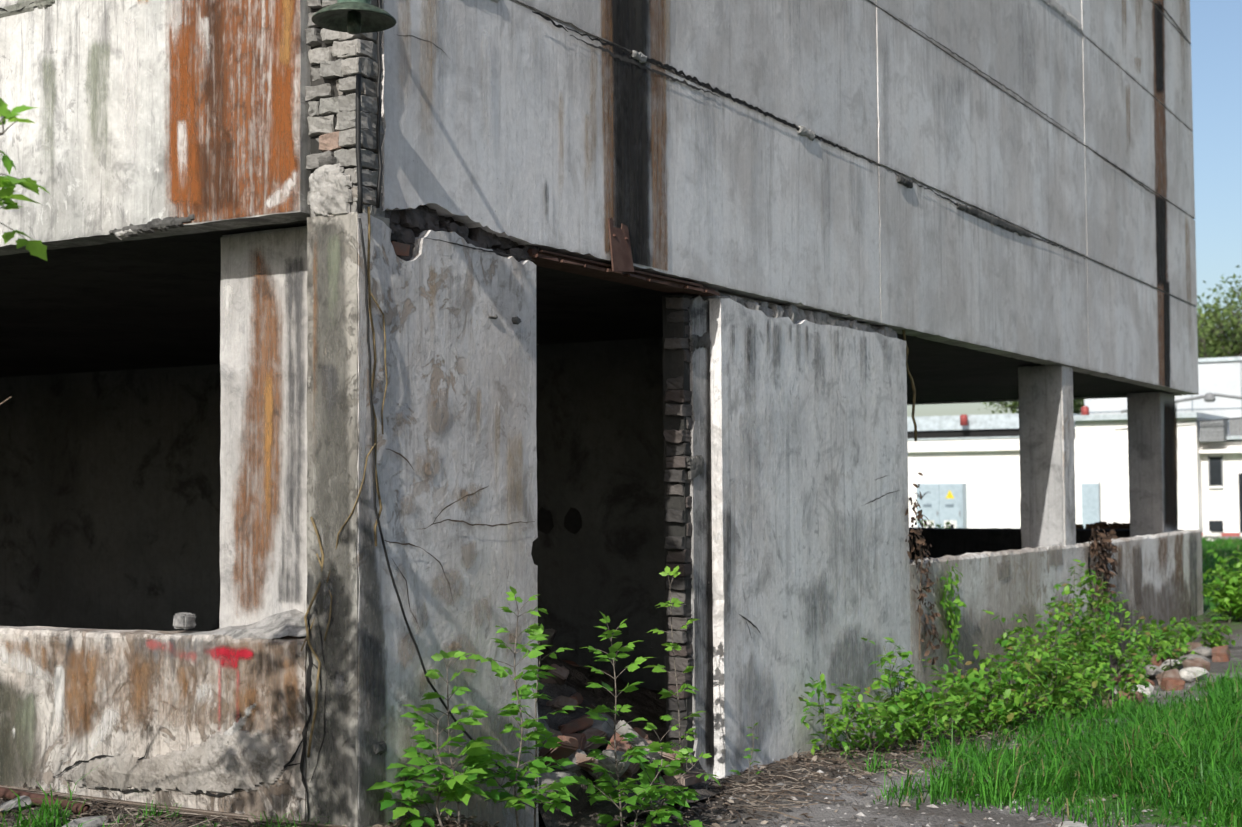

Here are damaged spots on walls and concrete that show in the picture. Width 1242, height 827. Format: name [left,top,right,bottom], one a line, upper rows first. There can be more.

corrosion [169,0,300,224]
spalling [385,205,540,273]
corrosion [1140,0,1170,387]
corrosion [234,248,318,608]
corrosion [1164,404,1178,529]
crack [384,486,535,628]
damp [0,681,34,786]
damp [0,637,73,721]
damp [91,711,116,750]